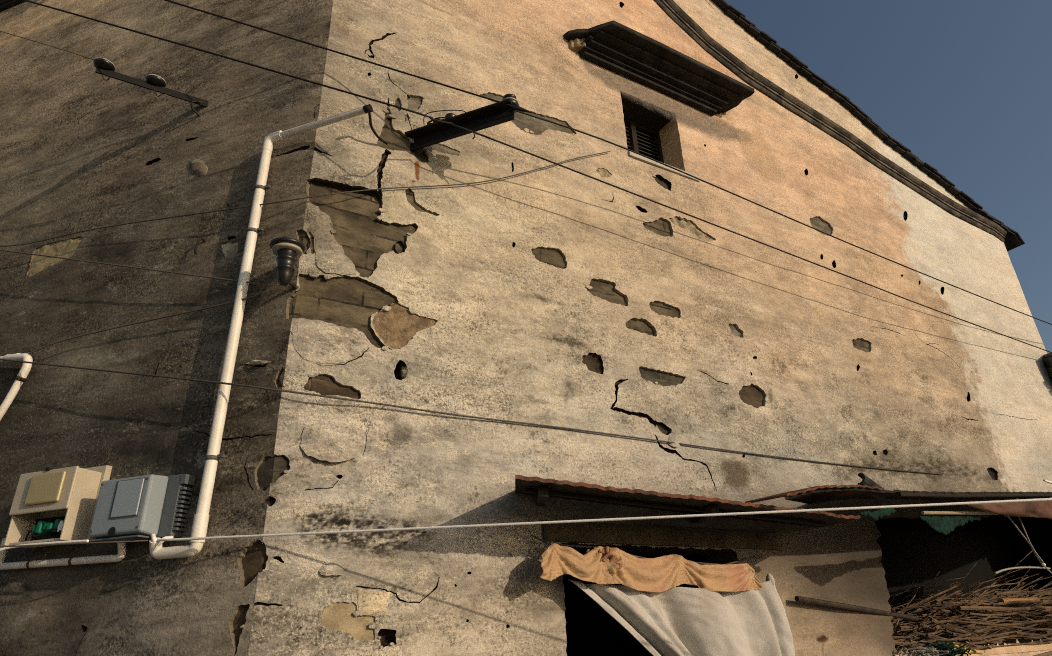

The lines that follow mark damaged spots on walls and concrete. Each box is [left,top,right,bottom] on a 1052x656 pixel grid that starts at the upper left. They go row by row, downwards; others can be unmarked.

crack [365,33,410,107]
crack [276,145,333,156]
crack [310,149,391,201]
flaking render [286,178,443,351]
peeling [531,246,567,269]
peeling [585,278,628,306]
peeling [626,300,681,337]
flaking render [304,374,361,399]
peeling [639,366,686,386]
peeling [739,372,766,408]
crack [610,379,717,491]
crack [355,577,440,603]